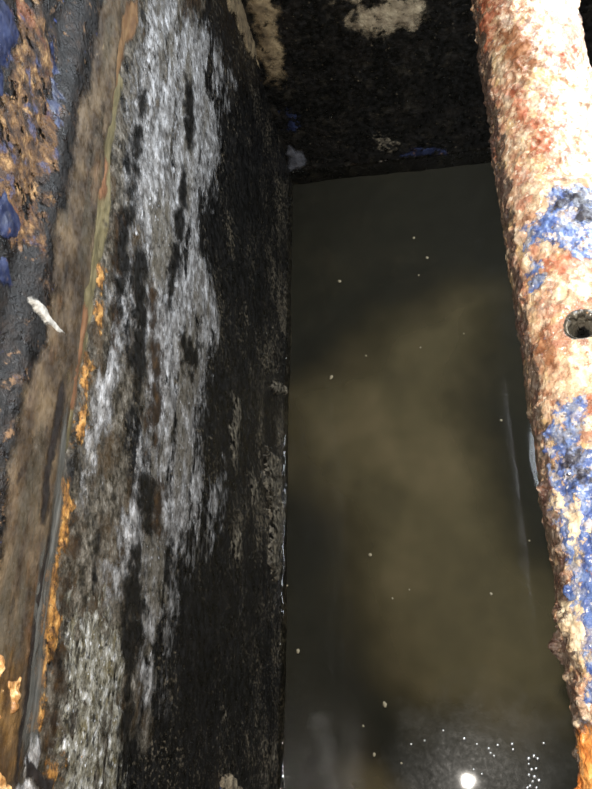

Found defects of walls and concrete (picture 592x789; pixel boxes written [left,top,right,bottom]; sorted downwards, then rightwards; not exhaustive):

corrosion [92,209,126,348]
corrosion [70,350,95,445]
damp [22,0,236,789]
corrosion [144,282,164,446]
corrosion [470,0,592,789]
corrosion [151,476,166,542]
corrosion [0,476,81,789]
damp [15,779,38,789]